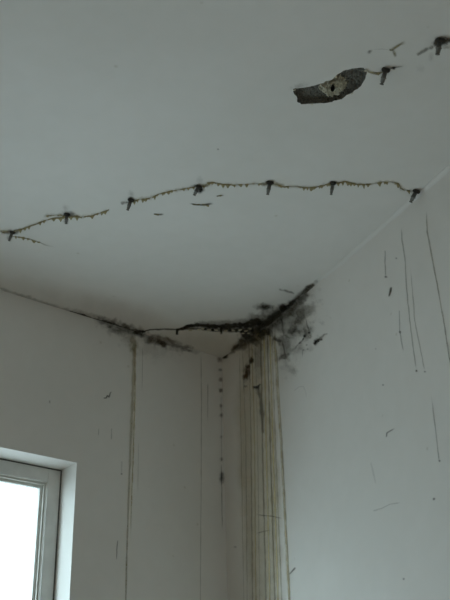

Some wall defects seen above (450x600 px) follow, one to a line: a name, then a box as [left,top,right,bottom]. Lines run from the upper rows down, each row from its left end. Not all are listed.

crack [367,44,401,76]
spalling [293,68,368,105]
crack [133,182,262,216]
crack [278,181,410,194]
crack [2,209,109,243]
damp [70,311,144,336]
damp [226,284,314,600]